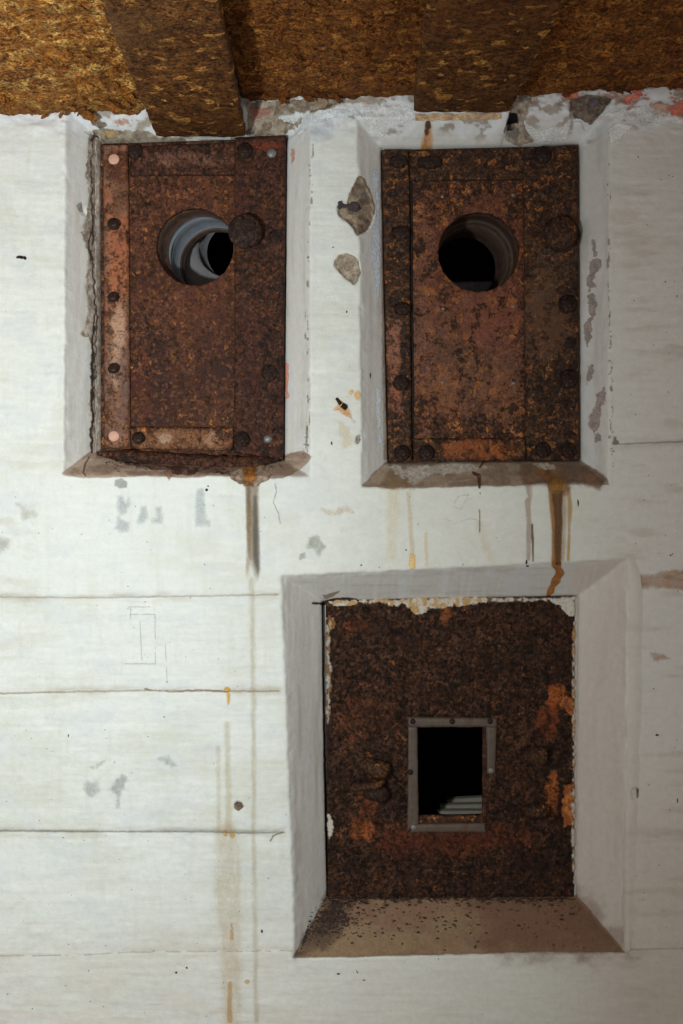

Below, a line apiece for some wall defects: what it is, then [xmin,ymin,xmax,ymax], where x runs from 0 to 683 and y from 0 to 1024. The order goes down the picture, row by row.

spalling [91,90,683,147]
peeling [584,239,610,344]
peeling [588,313,614,452]
corrosion [97,449,280,570]
corrosion [538,470,572,597]